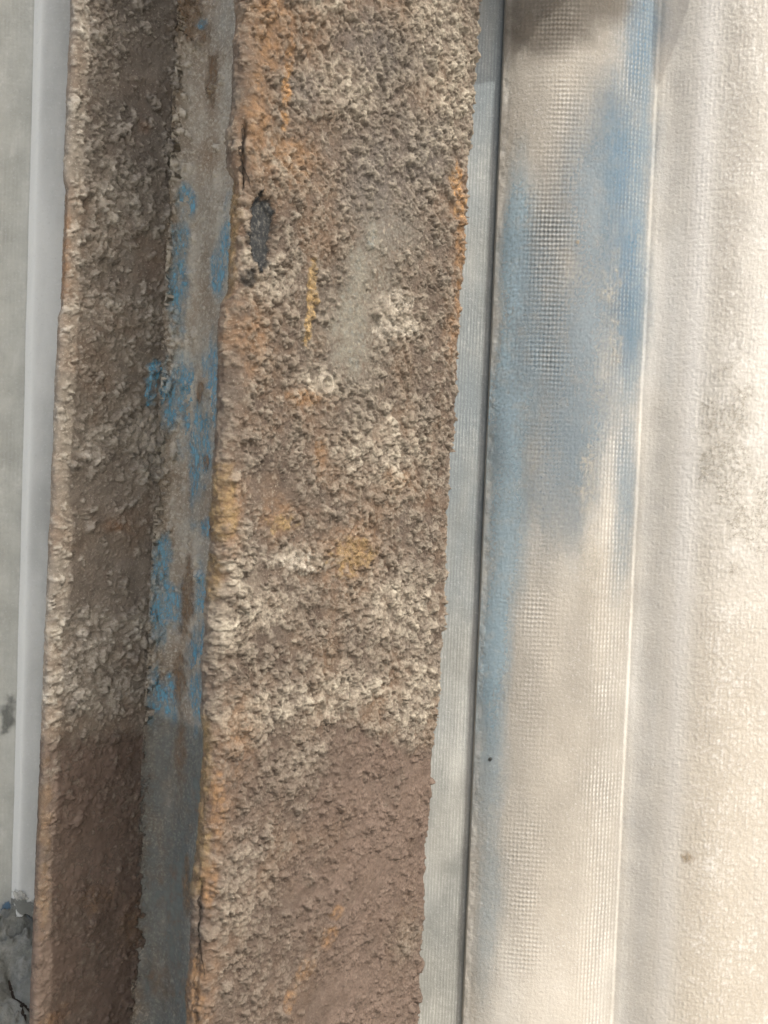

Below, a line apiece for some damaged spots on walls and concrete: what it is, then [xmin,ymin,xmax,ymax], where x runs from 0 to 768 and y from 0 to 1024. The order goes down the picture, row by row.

crack [238,124,250,191]
spalling [248,190,275,273]
peeling [144,350,218,496]
spalling [11,891,34,918]
crack [191,877,205,1024]